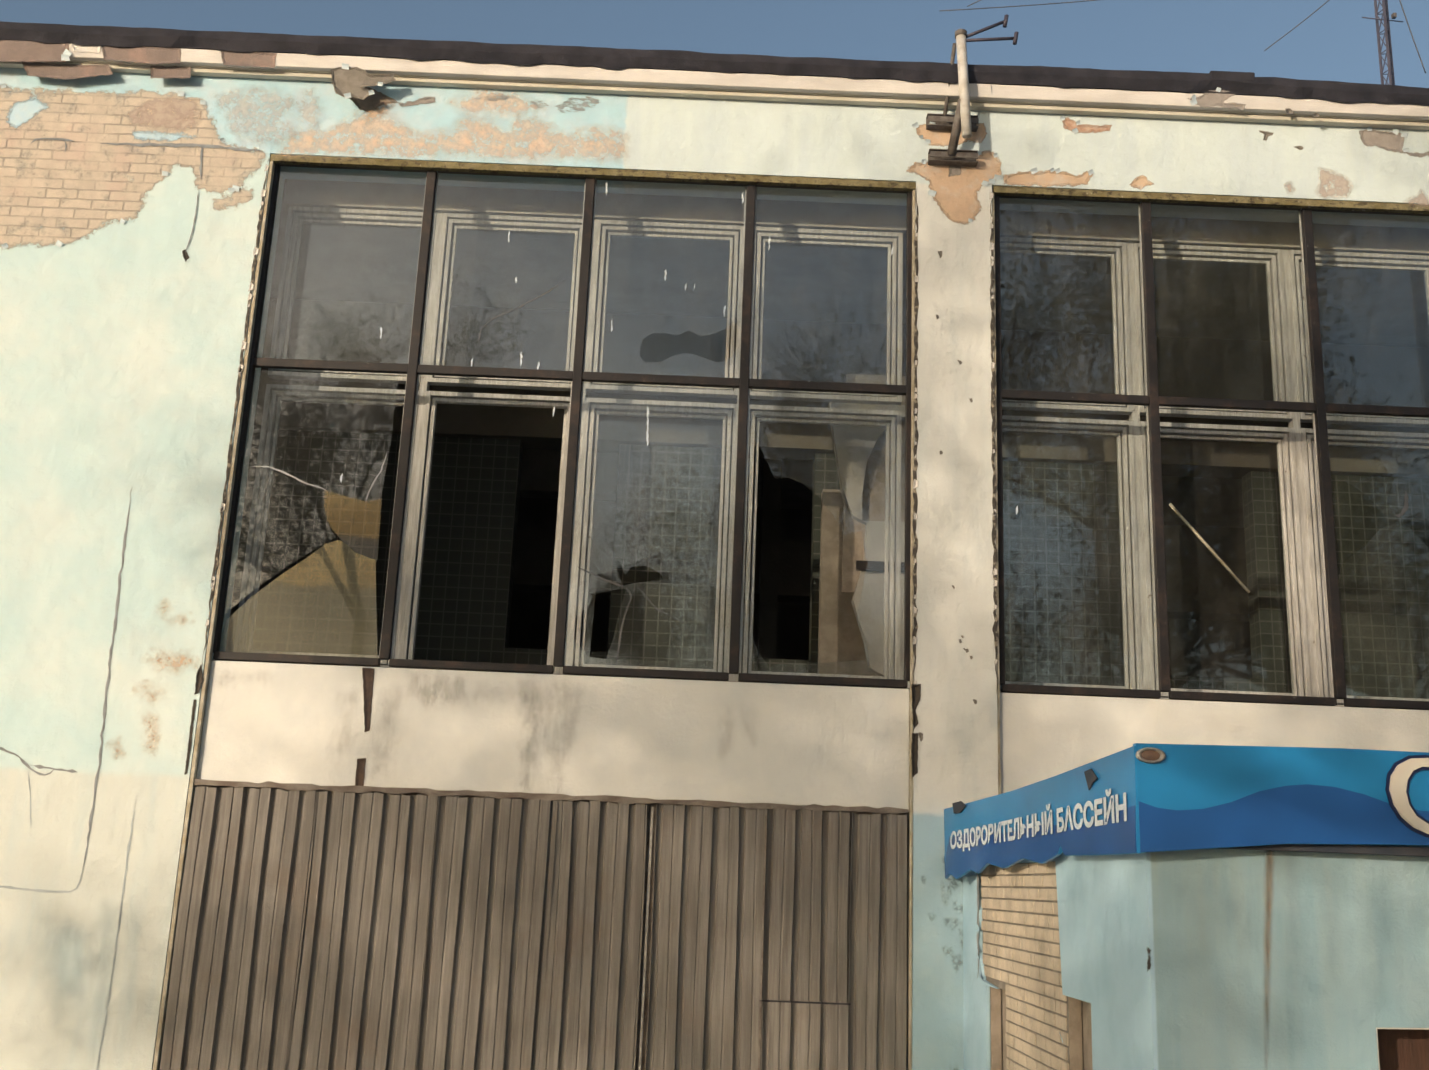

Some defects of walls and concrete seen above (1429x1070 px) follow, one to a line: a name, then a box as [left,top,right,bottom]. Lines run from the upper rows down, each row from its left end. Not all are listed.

peeling [288,82,624,156]
peeling [1059,115,1112,134]
flaking render [1359,127,1429,157]
peeling [1130,175,1153,190]
peeling [1319,170,1349,197]
flaking render [0,40,277,775]
flaking render [906,122,1094,777]
crack [0,489,132,893]
flaking render [362,668,374,732]
crack [96,802,136,1070]